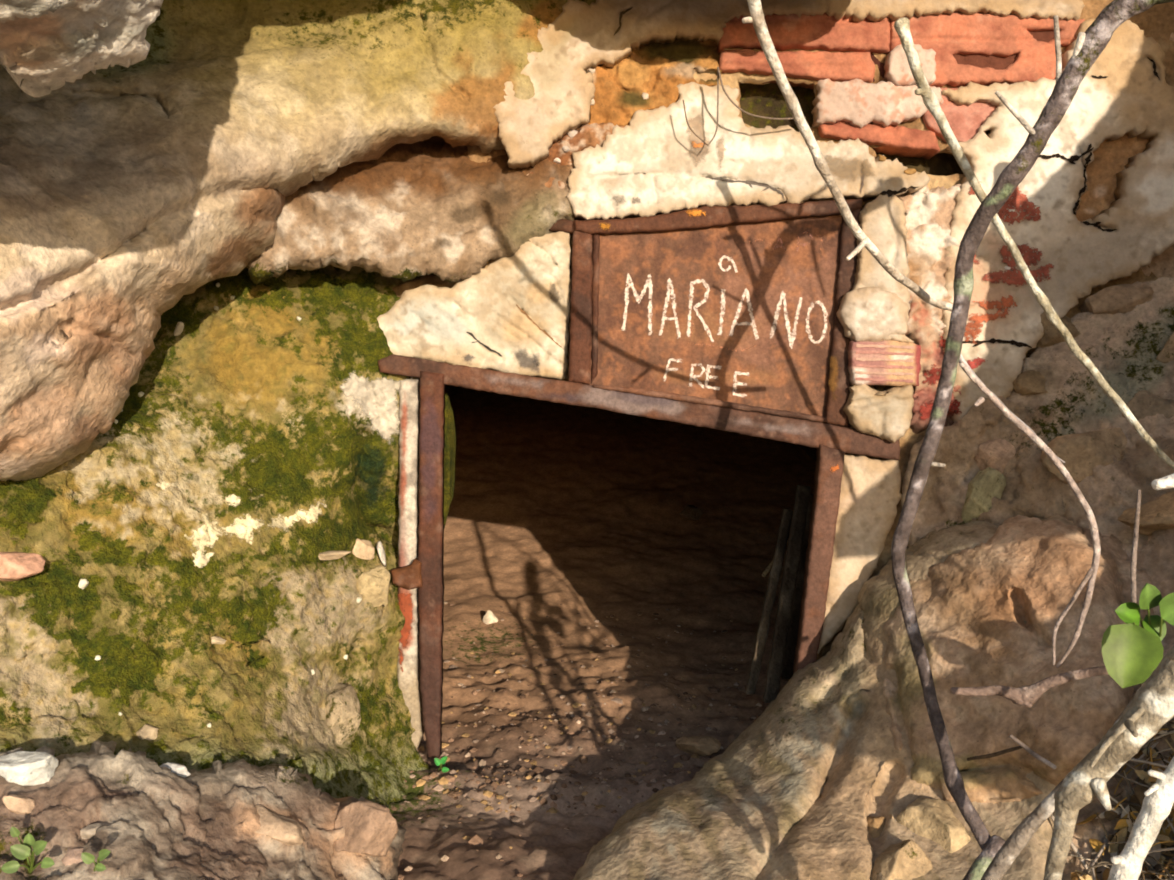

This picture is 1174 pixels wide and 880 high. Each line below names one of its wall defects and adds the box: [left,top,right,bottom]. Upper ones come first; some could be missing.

spalling [870,52,889,82]
spalling [740,83,815,132]
peeling [997,186,1041,225]
crack [1039,144,1117,232]
flaking render [1076,134,1149,222]
peeling [964,243,1054,369]
corrosion [829,357,838,392]
flaking render [848,340,941,387]
crack [963,338,1032,348]
peeling [947,399,962,415]
corrosion [398,593,413,672]